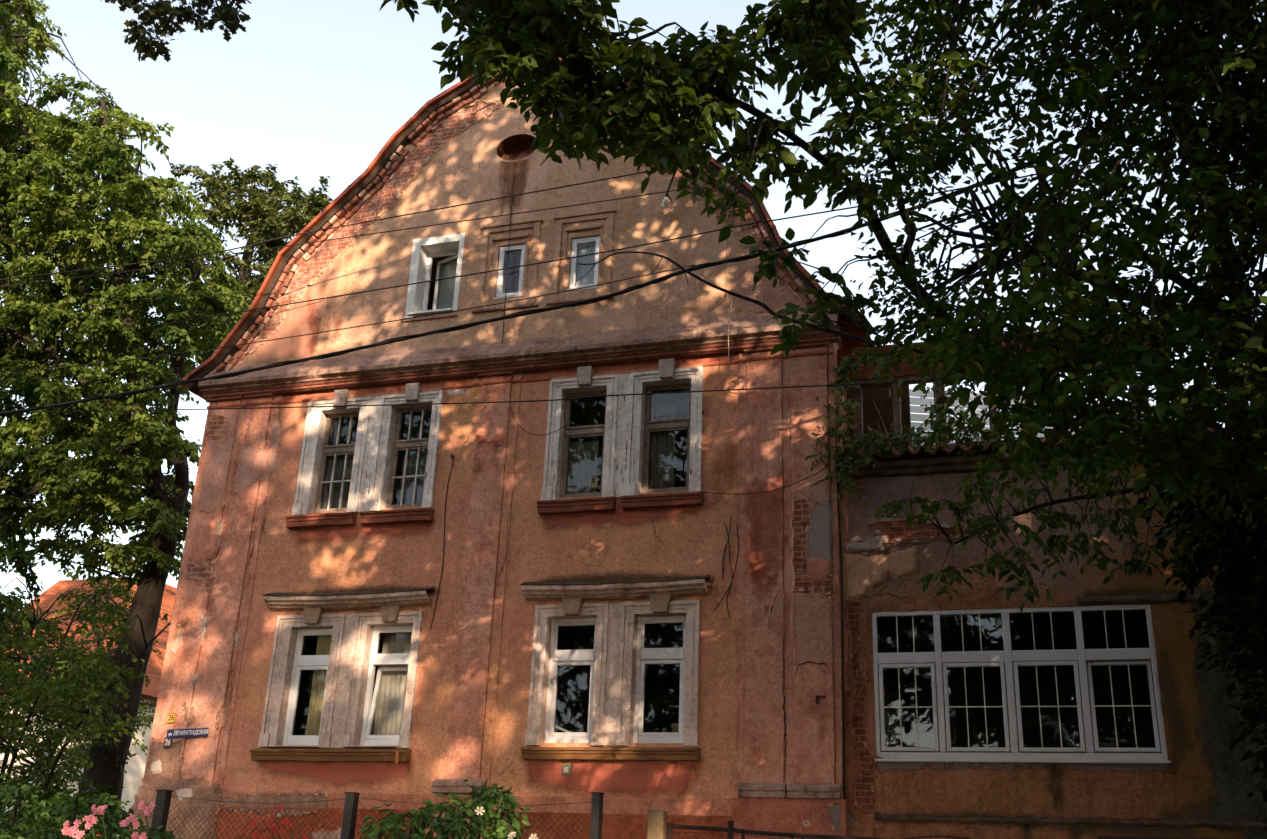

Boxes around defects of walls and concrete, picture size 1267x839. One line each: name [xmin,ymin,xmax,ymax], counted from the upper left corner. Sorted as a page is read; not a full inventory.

spalling [232,86,519,369]
damp [503,158,526,208]
peeling [185,402,283,593]
spalling [789,488,999,826]